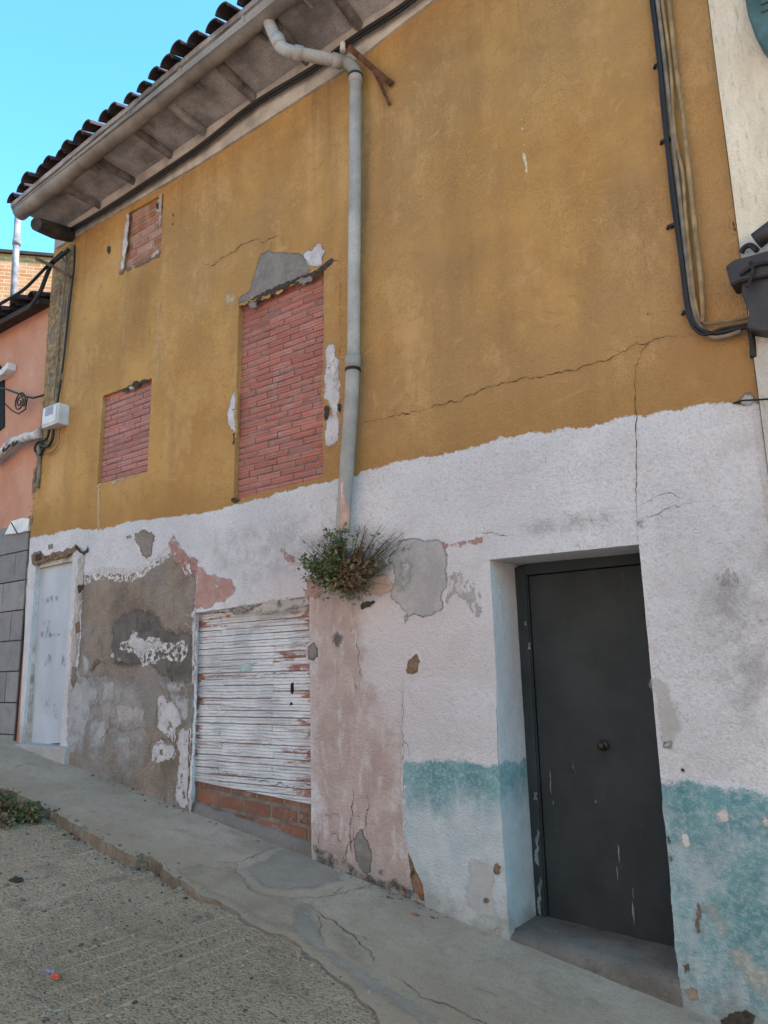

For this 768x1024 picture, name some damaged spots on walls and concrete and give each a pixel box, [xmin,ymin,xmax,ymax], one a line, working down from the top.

spalling [226,243,333,309]
peeling [321,339,343,451]
crack [357,333,694,539]
spalling [360,533,482,622]
flaking render [31,526,321,813]
spalling [403,650,423,679]
crack [204,791,375,961]
spalling [408,853,424,901]